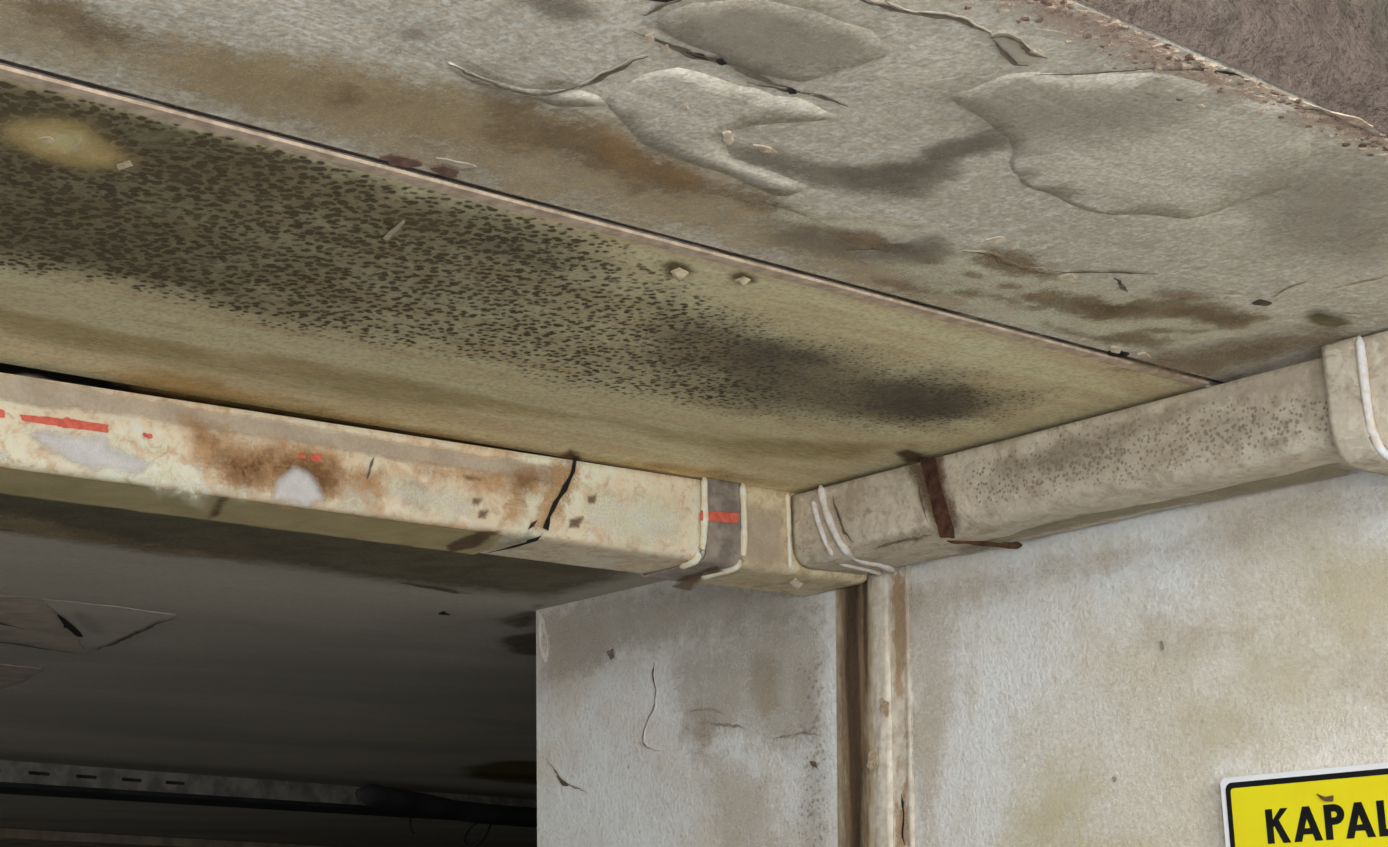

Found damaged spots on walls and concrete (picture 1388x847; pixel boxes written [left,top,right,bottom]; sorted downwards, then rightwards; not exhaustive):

crack [446,0,848,107]
crack [860,0,992,34]
peeling [990,0,1388,157]
water stain [0,0,1351,432]
rust [180,416,382,516]
peeling [274,469,321,504]
crack [489,457,577,553]
rust [897,451,958,528]
water stain [970,403,1328,503]
crack [639,665,660,751]
crack [691,708,819,739]
crack [545,758,587,794]